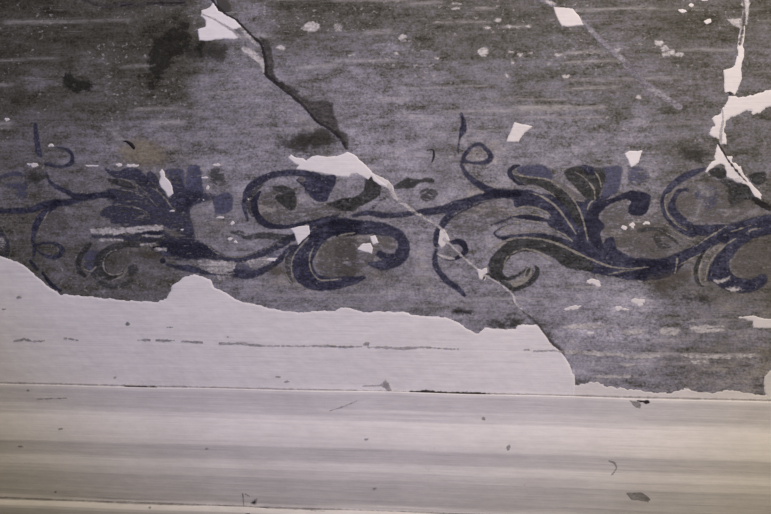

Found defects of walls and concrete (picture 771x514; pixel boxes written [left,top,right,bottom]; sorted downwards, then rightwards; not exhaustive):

water stain [63,73,92,93]
crack [88,0,188,8]
water stain [147,22,226,90]
peeling [198,3,242,41]
crack [212,0,348,149]
crack [723,0,750,95]
peeling [288,152,386,186]
crack [705,143,771,211]
peeling [358,235,378,254]
crack [371,173,564,354]
crack [142,339,452,350]
peeling [0,238,771,401]